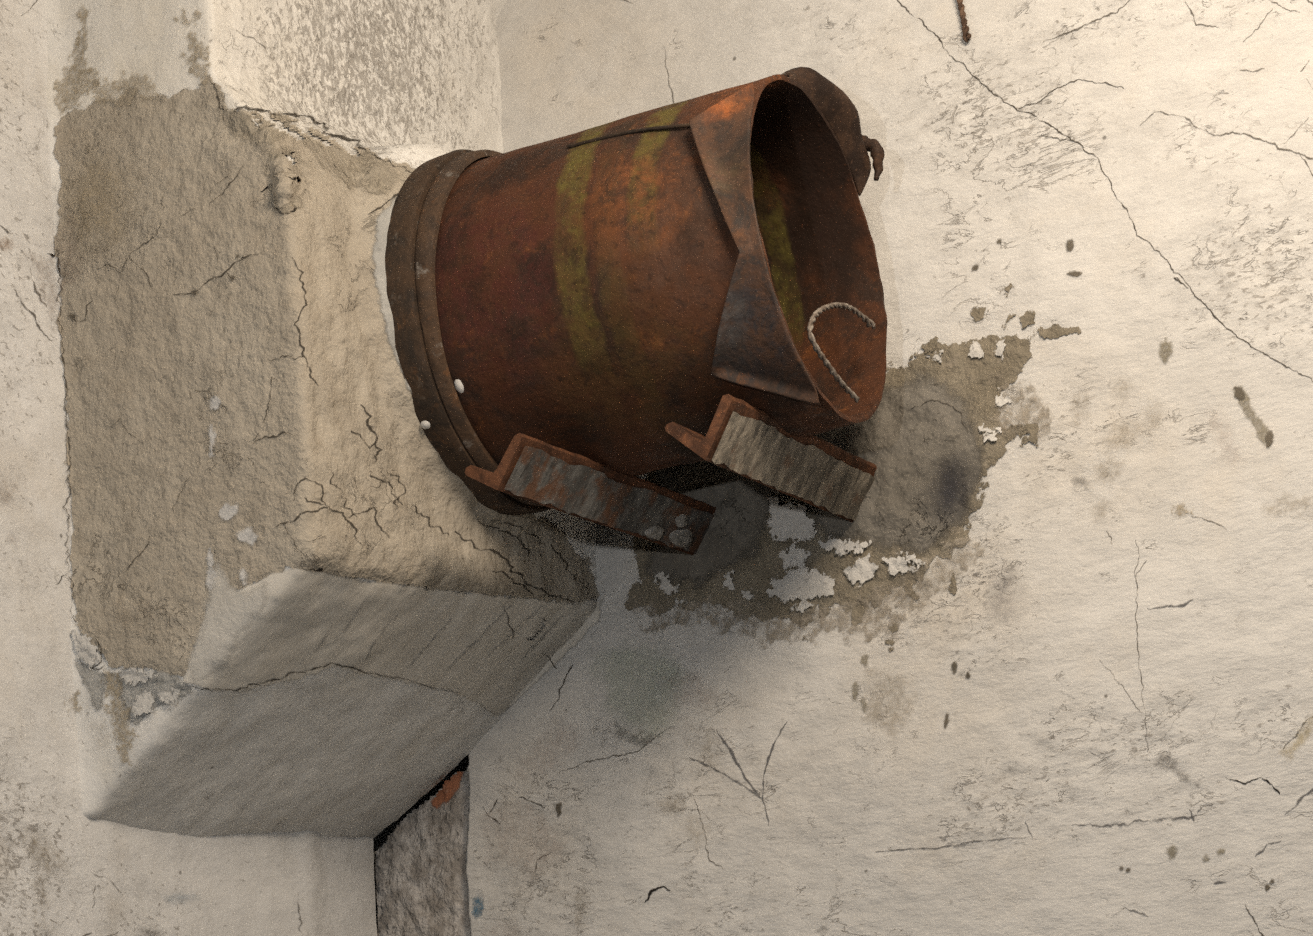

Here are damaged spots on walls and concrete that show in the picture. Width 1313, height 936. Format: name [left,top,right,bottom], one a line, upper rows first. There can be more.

crack [16,251,102,670]
crack [104,152,298,295]
crack [195,257,319,444]
crack [209,74,412,227]
peeling [53,8,599,765]
crack [276,404,590,602]
spalling [624,310,1081,664]
spalling [970,305,989,322]
crack [897,0,1313,381]
crack [192,663,454,692]
crack [541,653,573,710]